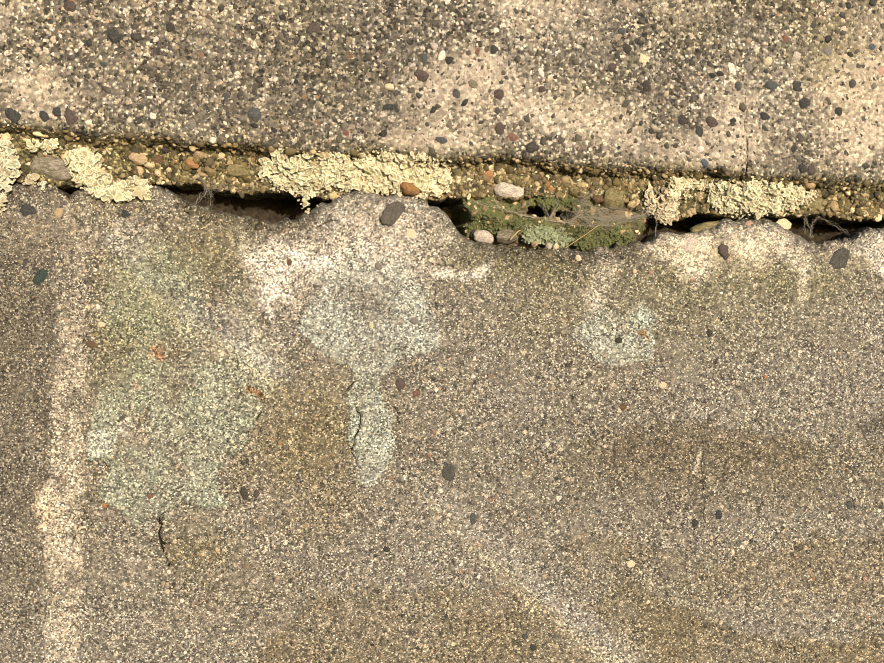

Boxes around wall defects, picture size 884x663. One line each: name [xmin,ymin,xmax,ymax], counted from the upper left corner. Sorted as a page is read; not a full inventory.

spalling [161,187,325,234]
peeling [149,226,251,304]
spalling [455,227,656,258]
spalling [805,237,852,250]
peeling [88,263,268,536]
peeling [296,284,442,482]
crack [123,511,177,566]